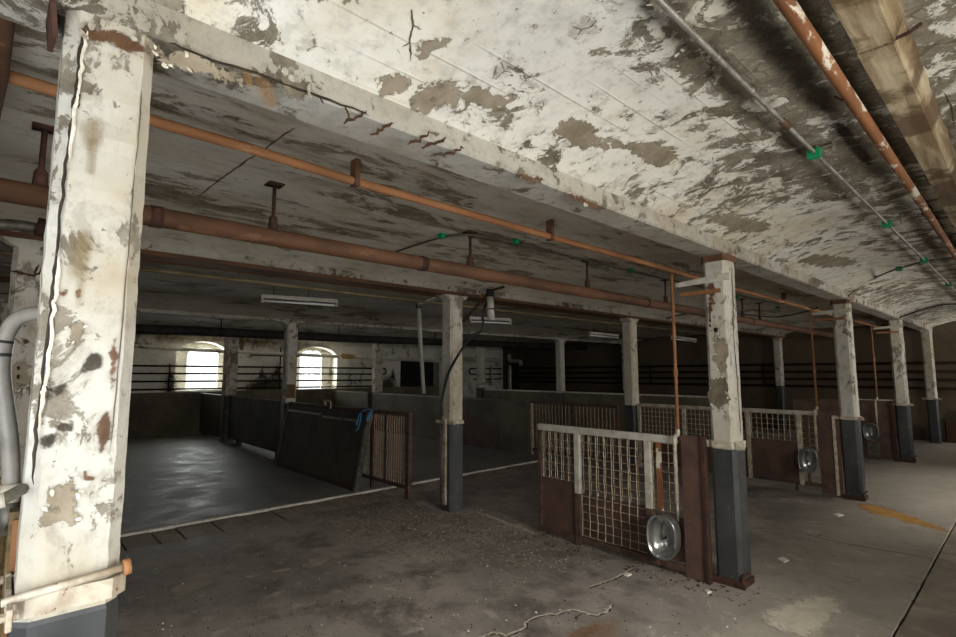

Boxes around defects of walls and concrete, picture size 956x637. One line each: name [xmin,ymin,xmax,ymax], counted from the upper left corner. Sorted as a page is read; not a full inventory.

peeling [79,19,243,87]
crack [403,9,421,58]
peeling [415,36,452,61]
crack [169,43,394,136]
peeling [375,73,516,115]
crack [200,128,294,196]
crack [407,131,464,156]
peeling [552,117,680,168]
peeling [705,211,771,234]
peeling [798,254,860,288]
peeling [708,339,731,412]
crack [479,567,636,637]